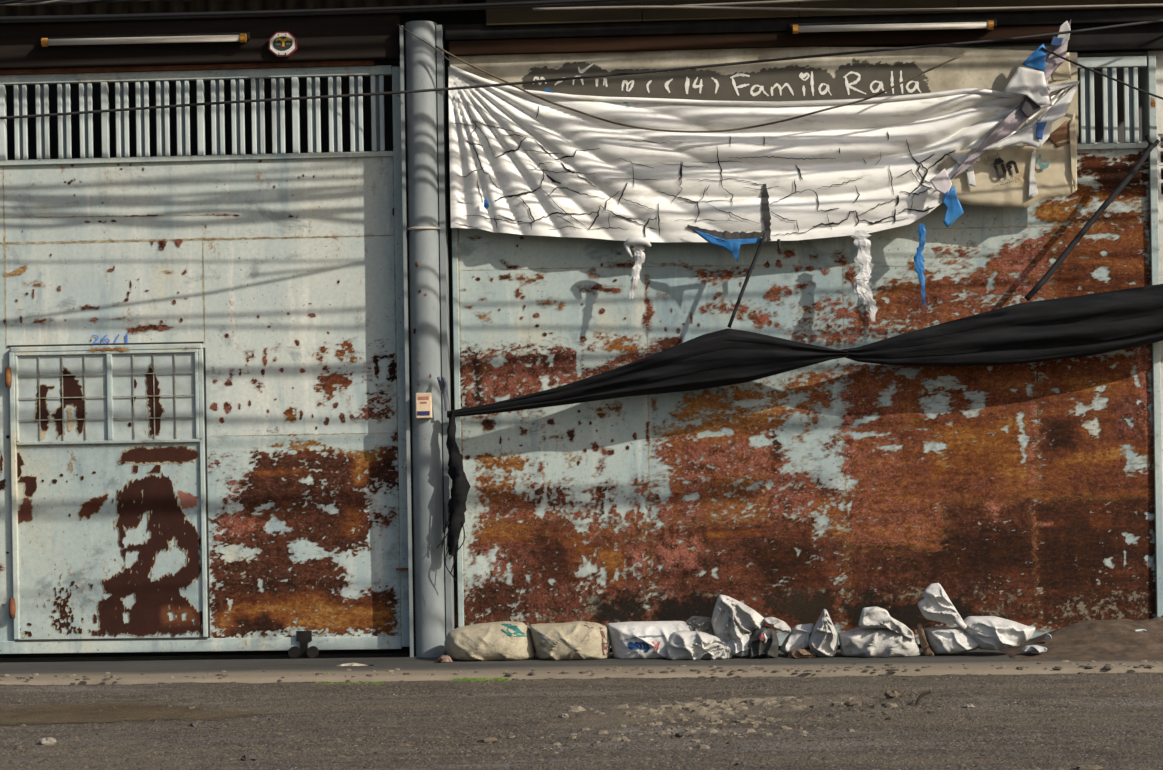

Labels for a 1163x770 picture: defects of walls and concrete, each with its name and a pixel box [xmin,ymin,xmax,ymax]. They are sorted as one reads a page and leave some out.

rust [207,332,399,638]
rust [451,150,1156,638]